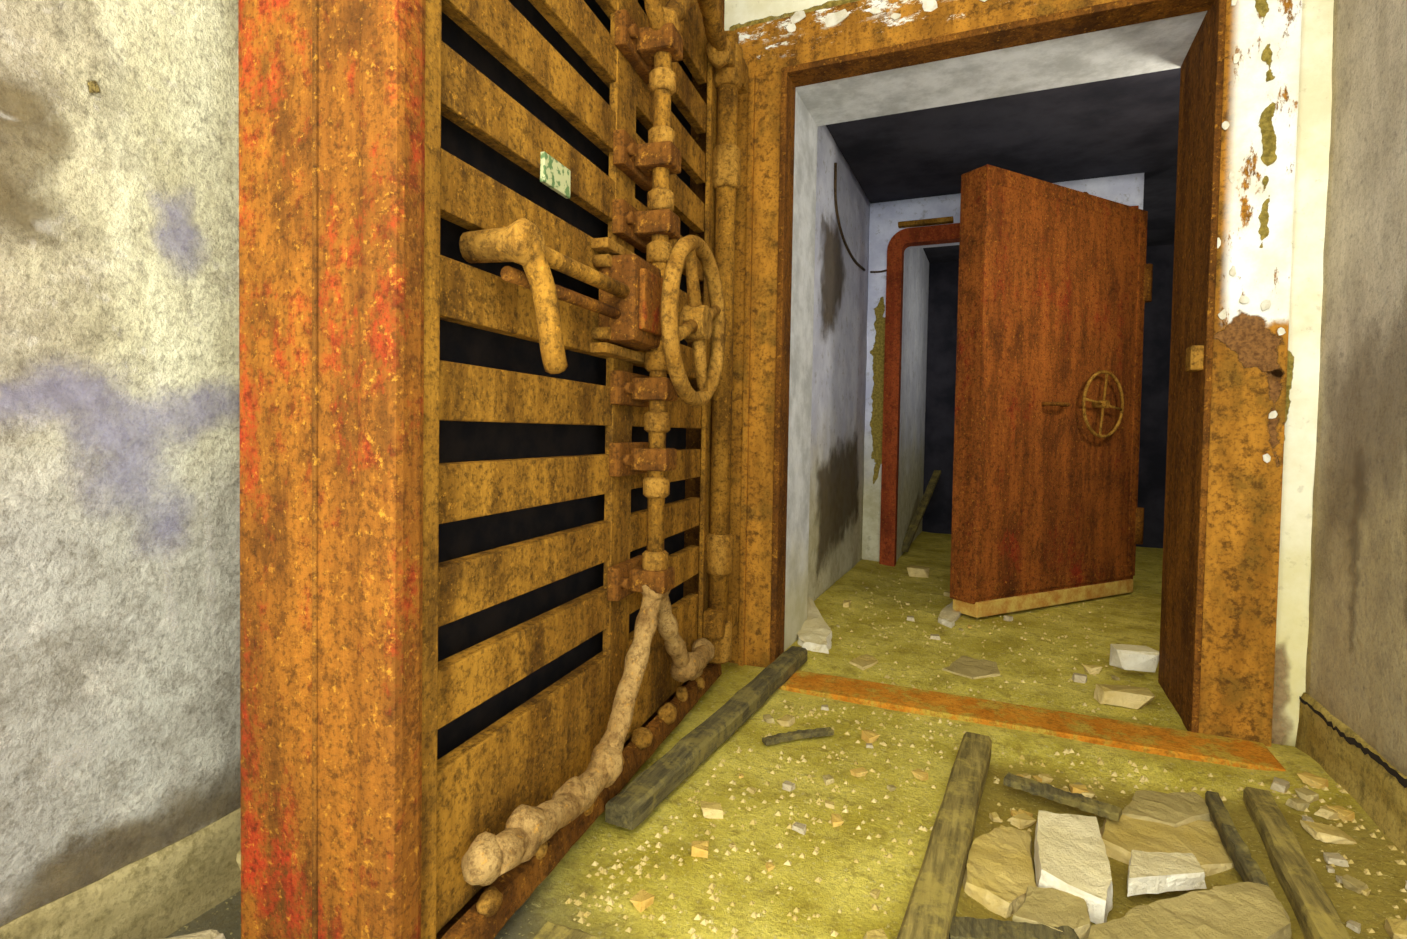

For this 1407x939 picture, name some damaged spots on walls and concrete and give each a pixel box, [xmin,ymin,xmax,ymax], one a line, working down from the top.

peeling [729,0,901,32]
peeling [922,0,938,12]
peeling [1255,0,1269,24]
peeling [1261,44,1275,82]
peeling [1258,102,1277,248]
peeling [1214,295,1294,467]
corrosion [1271,646,1290,745]
crack [1299,696,1407,788]